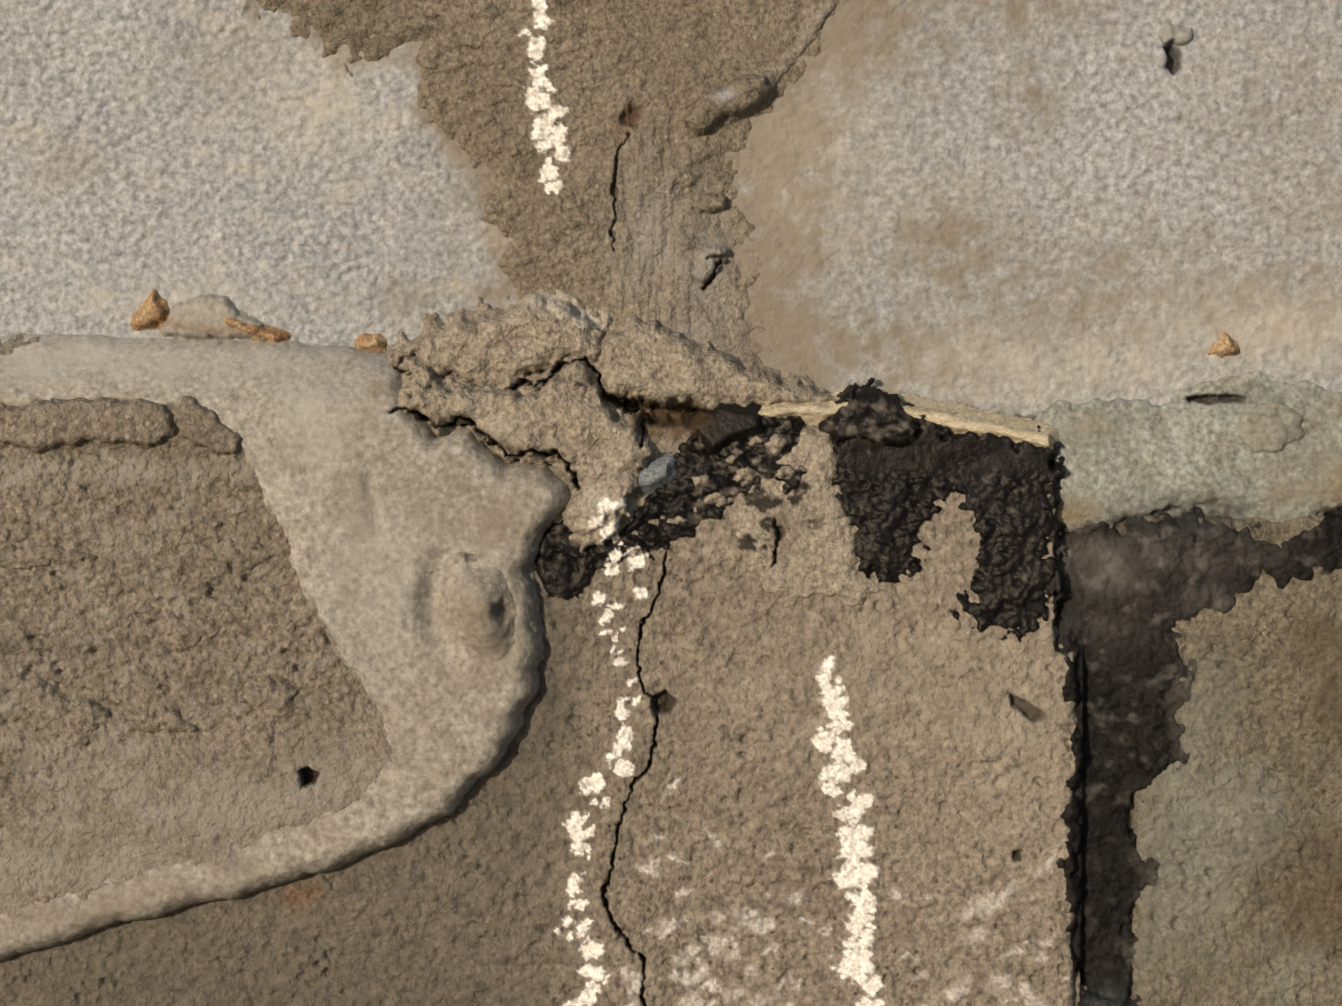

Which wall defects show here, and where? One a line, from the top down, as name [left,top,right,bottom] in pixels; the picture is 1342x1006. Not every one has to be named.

leakage [633,402,707,436]
spalling [0,395,394,919]
crack [601,550,667,1006]